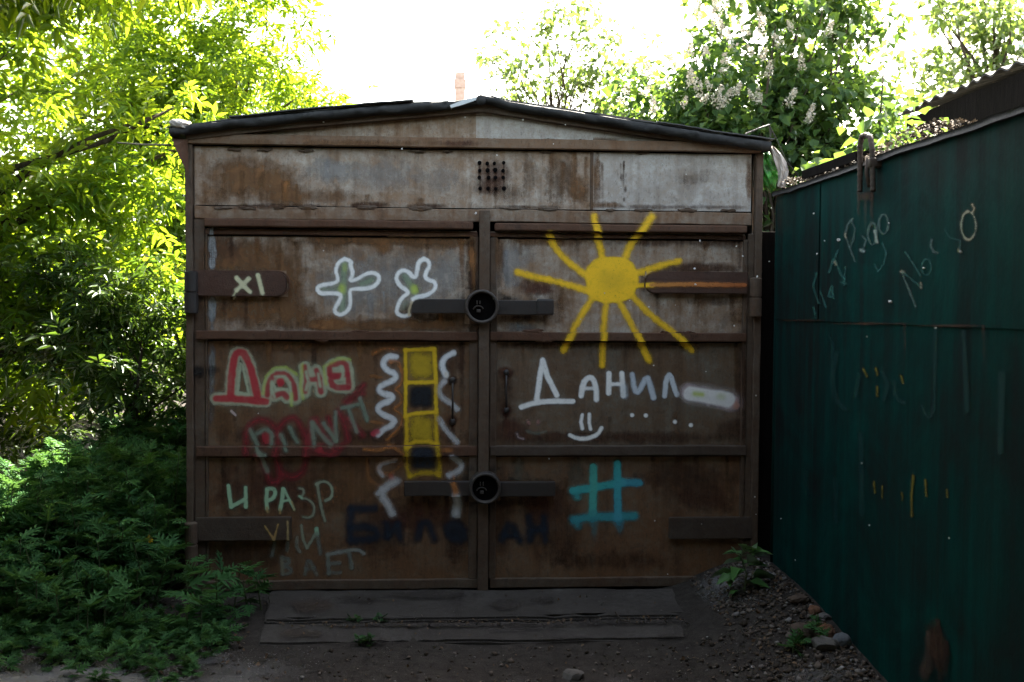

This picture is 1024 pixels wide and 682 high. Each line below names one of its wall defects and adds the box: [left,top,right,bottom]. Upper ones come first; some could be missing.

corrosion [204,158,336,210]
corrosion [549,138,618,208]